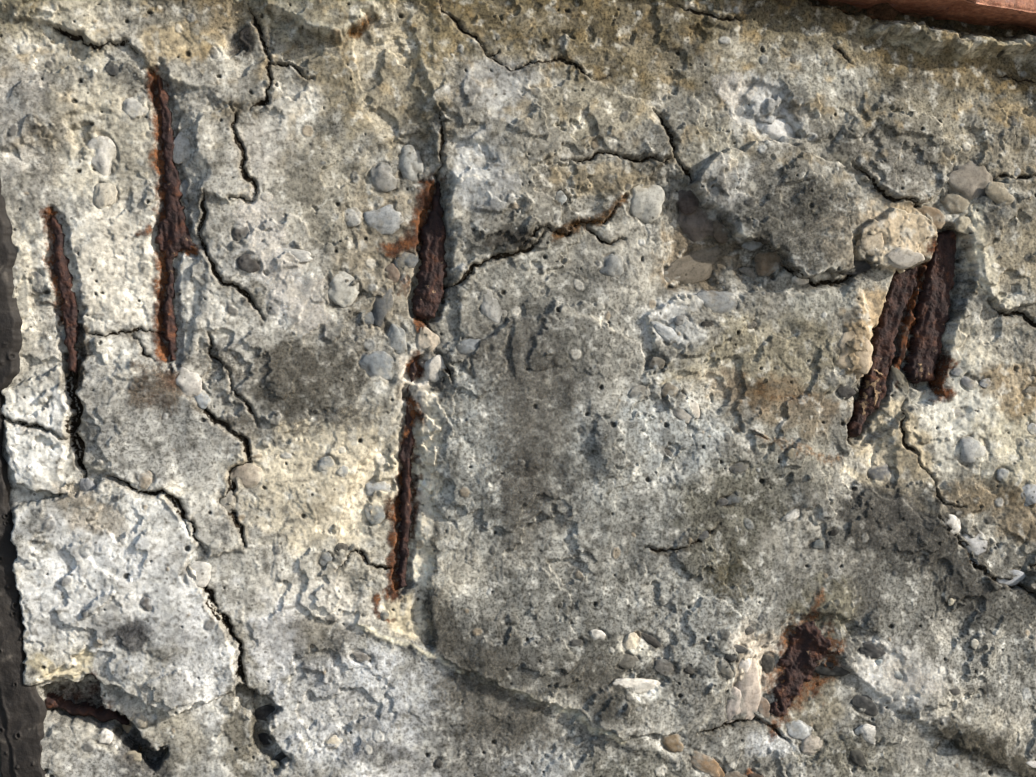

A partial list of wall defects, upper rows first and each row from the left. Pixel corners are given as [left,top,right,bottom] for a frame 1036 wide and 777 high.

corrosion [41,206,80,374]
crack [10,370,203,548]
peeling [1,80,289,773]
corrosion [135,66,199,387]
crack [203,335,258,546]
crack [197,11,312,319]
spalling [319,132,463,645]
corrosion [372,351,425,623]
spalling [659,79,1036,591]
corrosion [846,230,958,441]
crack [203,586,255,692]
corrosion [768,588,844,737]